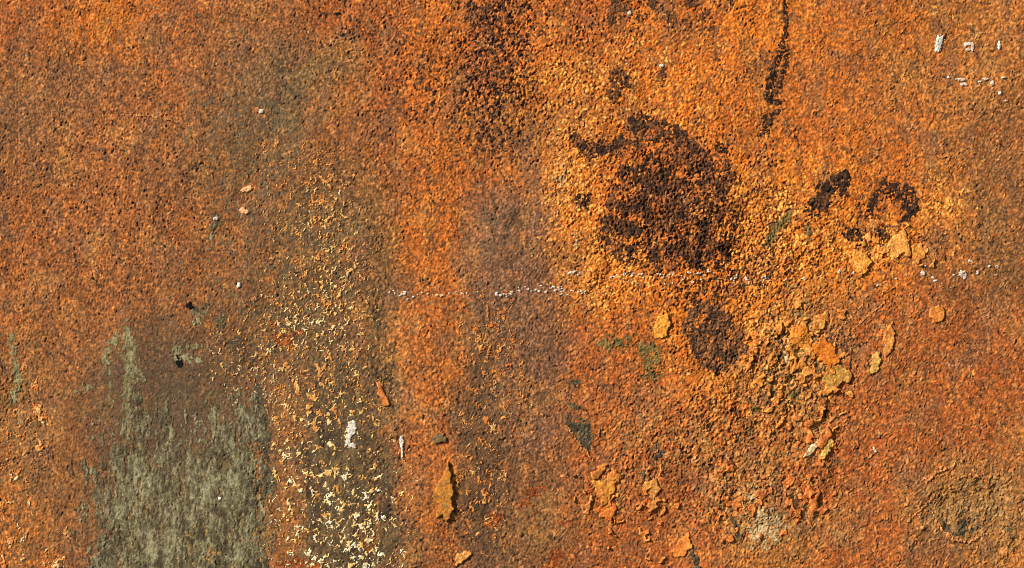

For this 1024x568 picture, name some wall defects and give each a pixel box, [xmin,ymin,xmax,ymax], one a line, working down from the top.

rust [605,0,716,31]
rust [388,0,544,162]
rust [606,66,632,104]
rust [804,169,935,277]
peeling [196,141,419,568]
rust [567,113,854,542]
rust [870,322,895,374]
rust [432,461,455,522]
rust [561,458,629,549]
spalling [640,449,665,477]
rust [455,550,472,566]
rust [645,532,693,563]